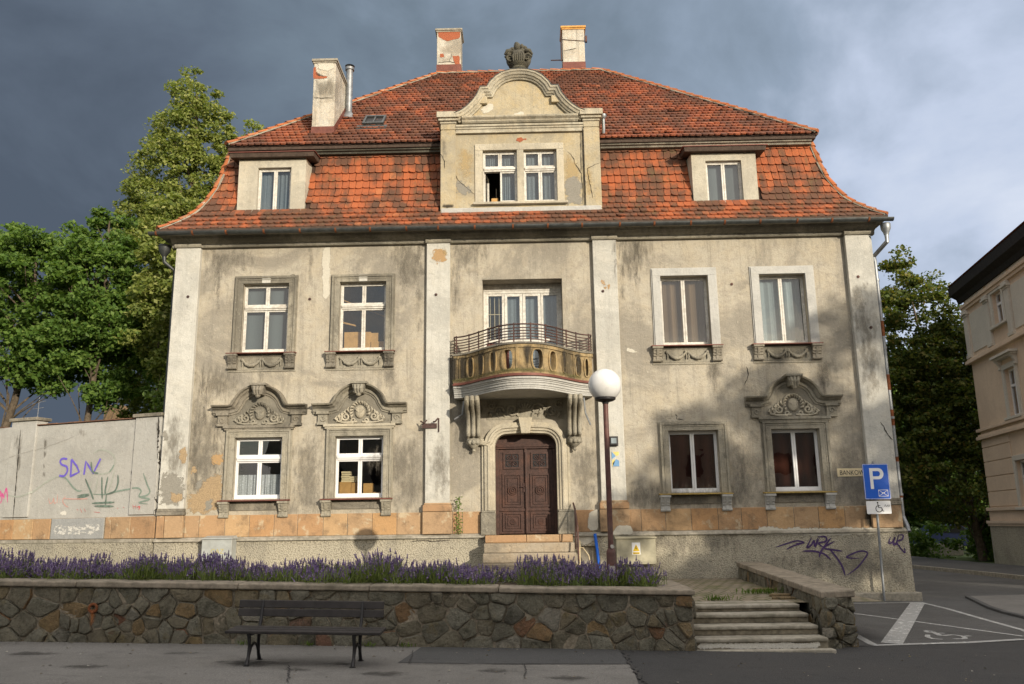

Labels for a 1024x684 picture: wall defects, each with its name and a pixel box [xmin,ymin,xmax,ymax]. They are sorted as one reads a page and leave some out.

spalling [438,32,460,41]
crack [567,127,599,204]
peeling [432,248,447,264]
peeling [157,447,223,514]